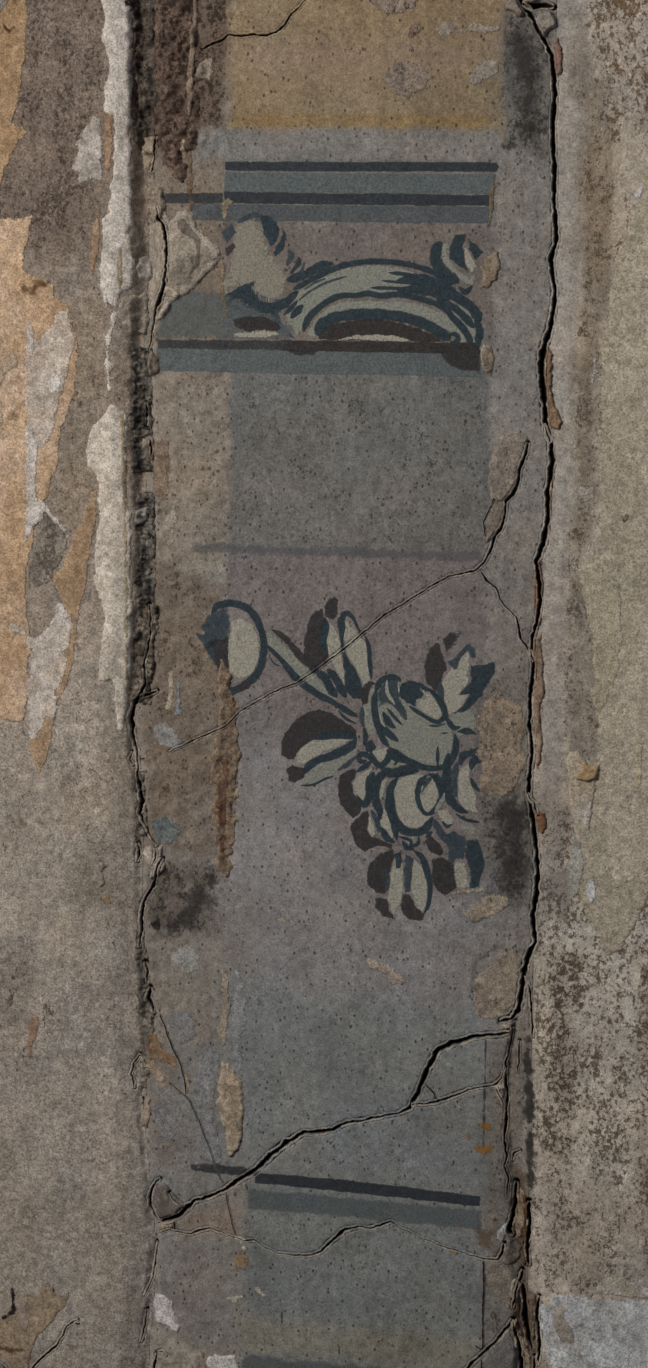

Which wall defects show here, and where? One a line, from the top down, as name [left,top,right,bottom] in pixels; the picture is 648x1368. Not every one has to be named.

water stain [506,32,541,150]
peeling [0,0,213,774]
crack [125,0,561,1368]
peeling [0,1283,70,1368]
crack [0,1318,79,1368]
peeling [551,1306,575,1343]